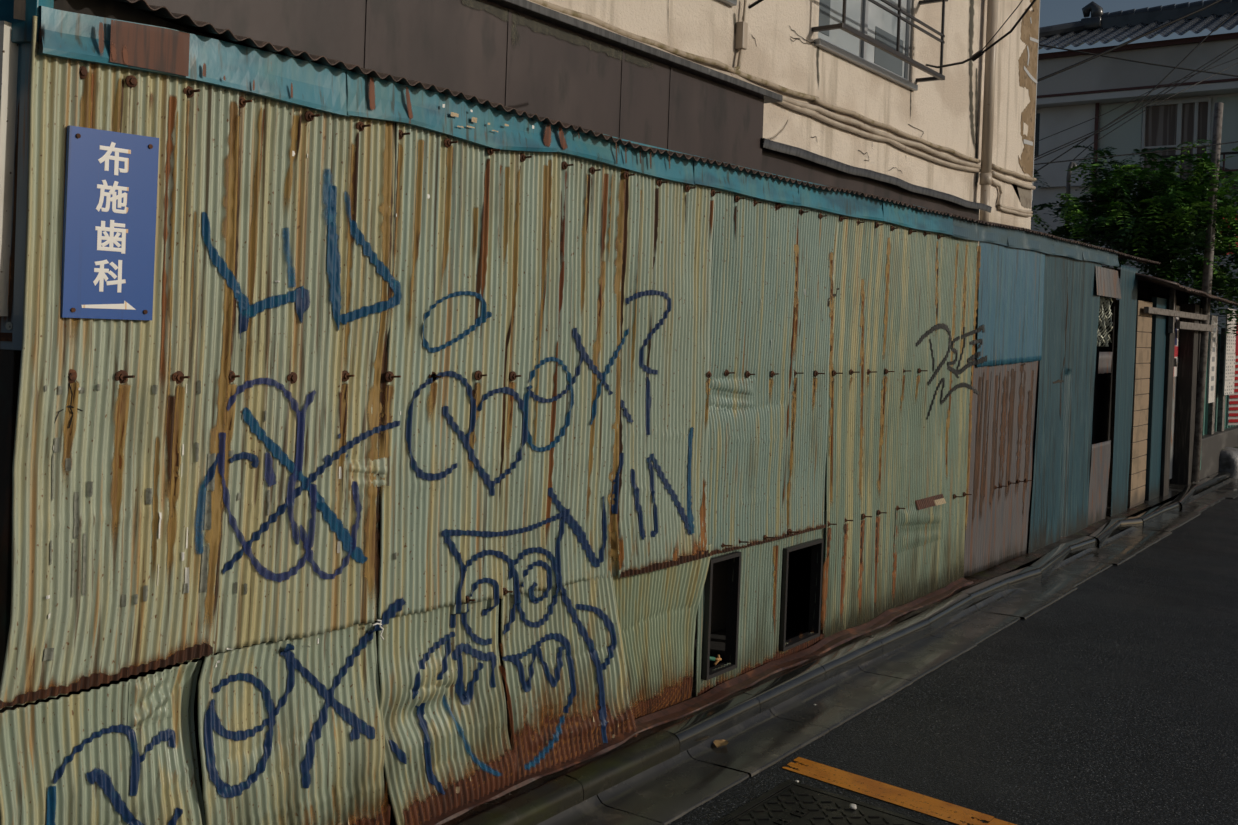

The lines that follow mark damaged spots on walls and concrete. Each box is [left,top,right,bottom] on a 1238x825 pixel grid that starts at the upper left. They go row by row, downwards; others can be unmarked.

corrosion [4,101,20,322]
corrosion [63,382,79,472]
corrosion [80,72,94,128]
corrosion [111,385,131,536]
corrosion [152,96,197,571]
corrosion [205,101,265,623]
corrosion [338,384,348,472]
corrosion [344,133,359,360]
corrosion [349,121,964,825]
corrosion [935,241,1034,527]
peeling [1012,0,1040,209]
corrosion [0,643,213,709]